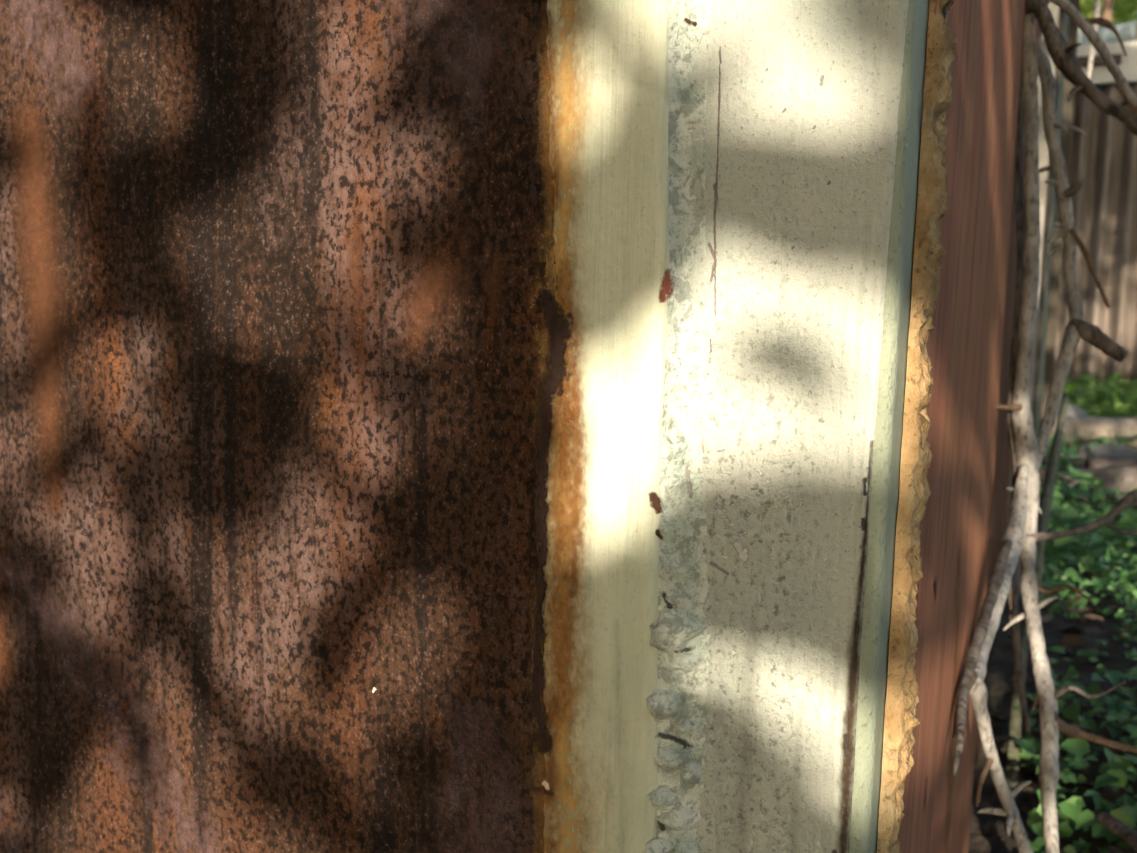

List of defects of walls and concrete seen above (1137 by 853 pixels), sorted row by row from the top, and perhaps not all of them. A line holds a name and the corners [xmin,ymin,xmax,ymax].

rust [10,0,92,96]
rust [659,268,673,302]
rust [531,0,587,853]
rust [649,492,662,514]
rust [0,554,213,853]